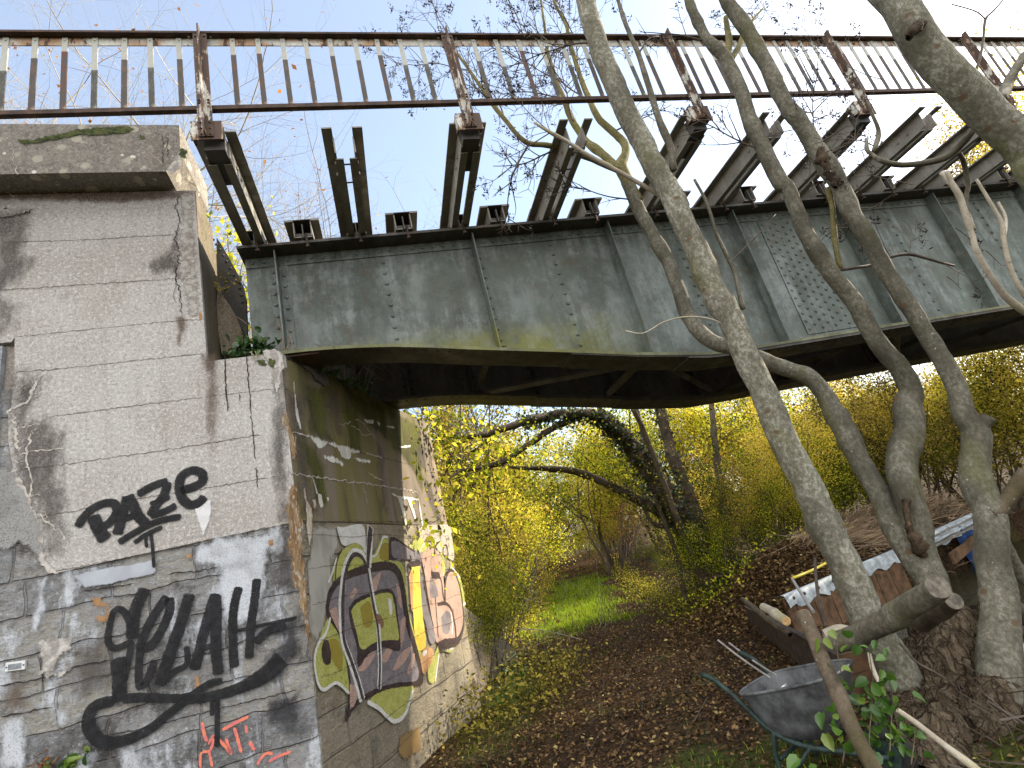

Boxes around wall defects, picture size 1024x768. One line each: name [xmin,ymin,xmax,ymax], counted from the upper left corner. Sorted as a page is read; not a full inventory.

water stain [0,191,186,290]
crack [173,193,184,313]
crack [224,354,258,487]
spalling [281,411,297,459]
water stain [273,382,439,525]
spalling [285,484,316,646]